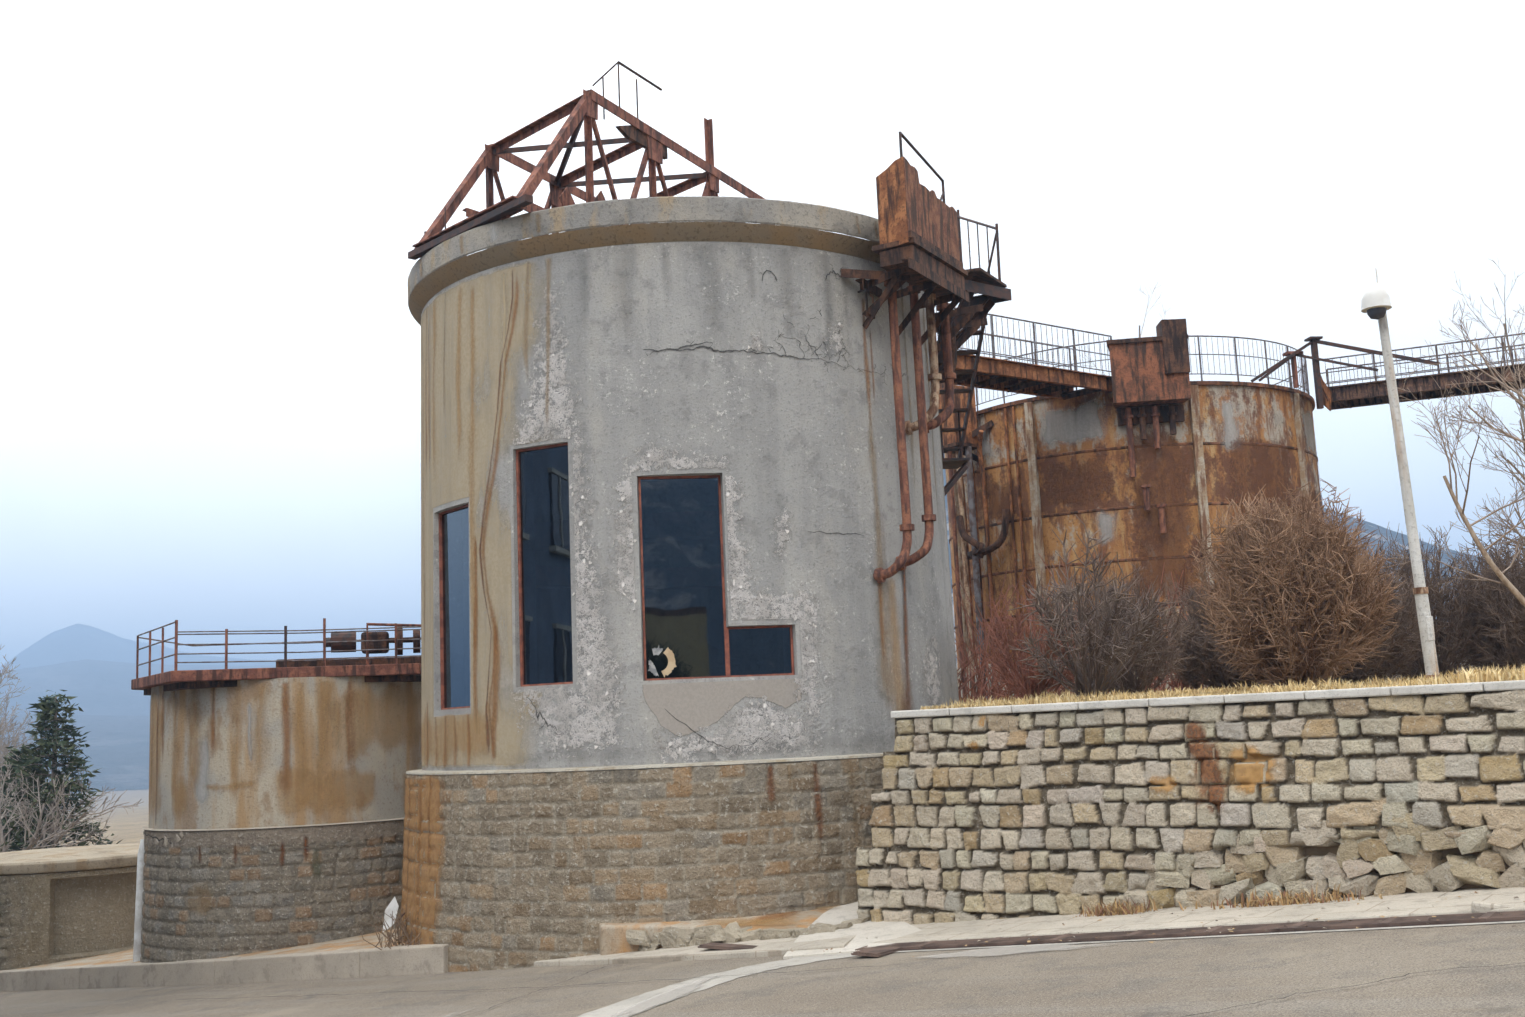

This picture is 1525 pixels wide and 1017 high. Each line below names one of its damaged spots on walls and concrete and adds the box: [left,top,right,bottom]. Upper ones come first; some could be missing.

crack [643,264,905,385]
rust [400,263,539,945]
peeling [510,280,827,763]
rust [1131,433,1200,604]
rust [1230,437,1327,544]